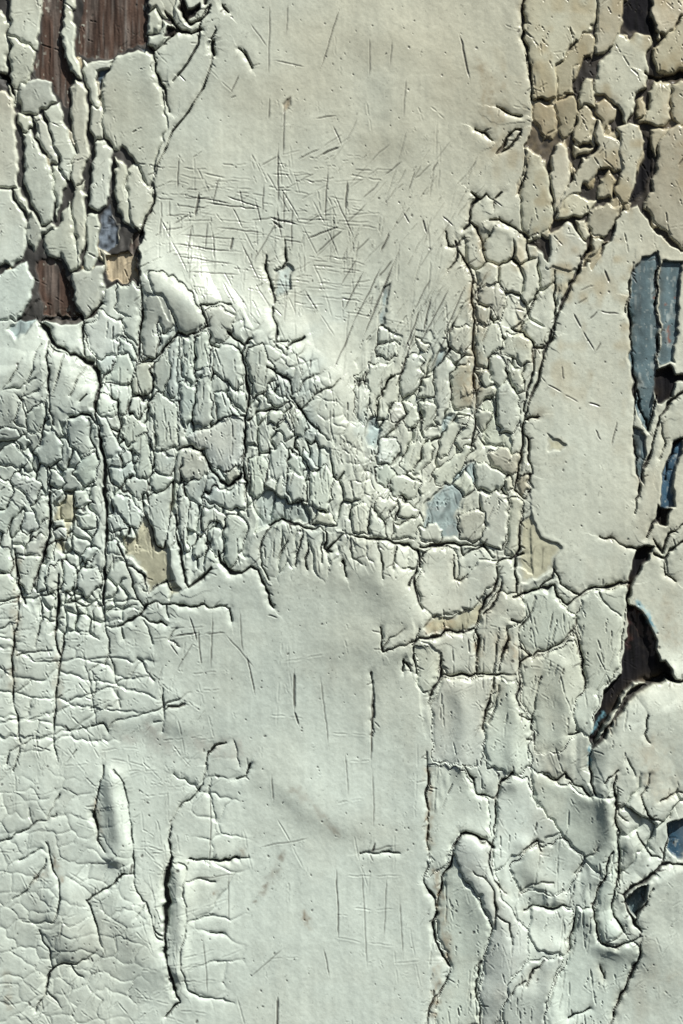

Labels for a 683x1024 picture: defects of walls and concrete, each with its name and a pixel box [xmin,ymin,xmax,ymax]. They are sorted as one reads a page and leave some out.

crack [0,73,16,106]
crack [139,0,253,238]
crack [445,0,534,451]
crack [644,71,683,82]
peeling [0,0,183,1024]
crack [0,239,630,772]
peeling [141,0,683,1024]
crack [599,251,683,582]
crack [0,741,252,1019]
crack [360,848,401,856]
crack [423,672,683,1024]